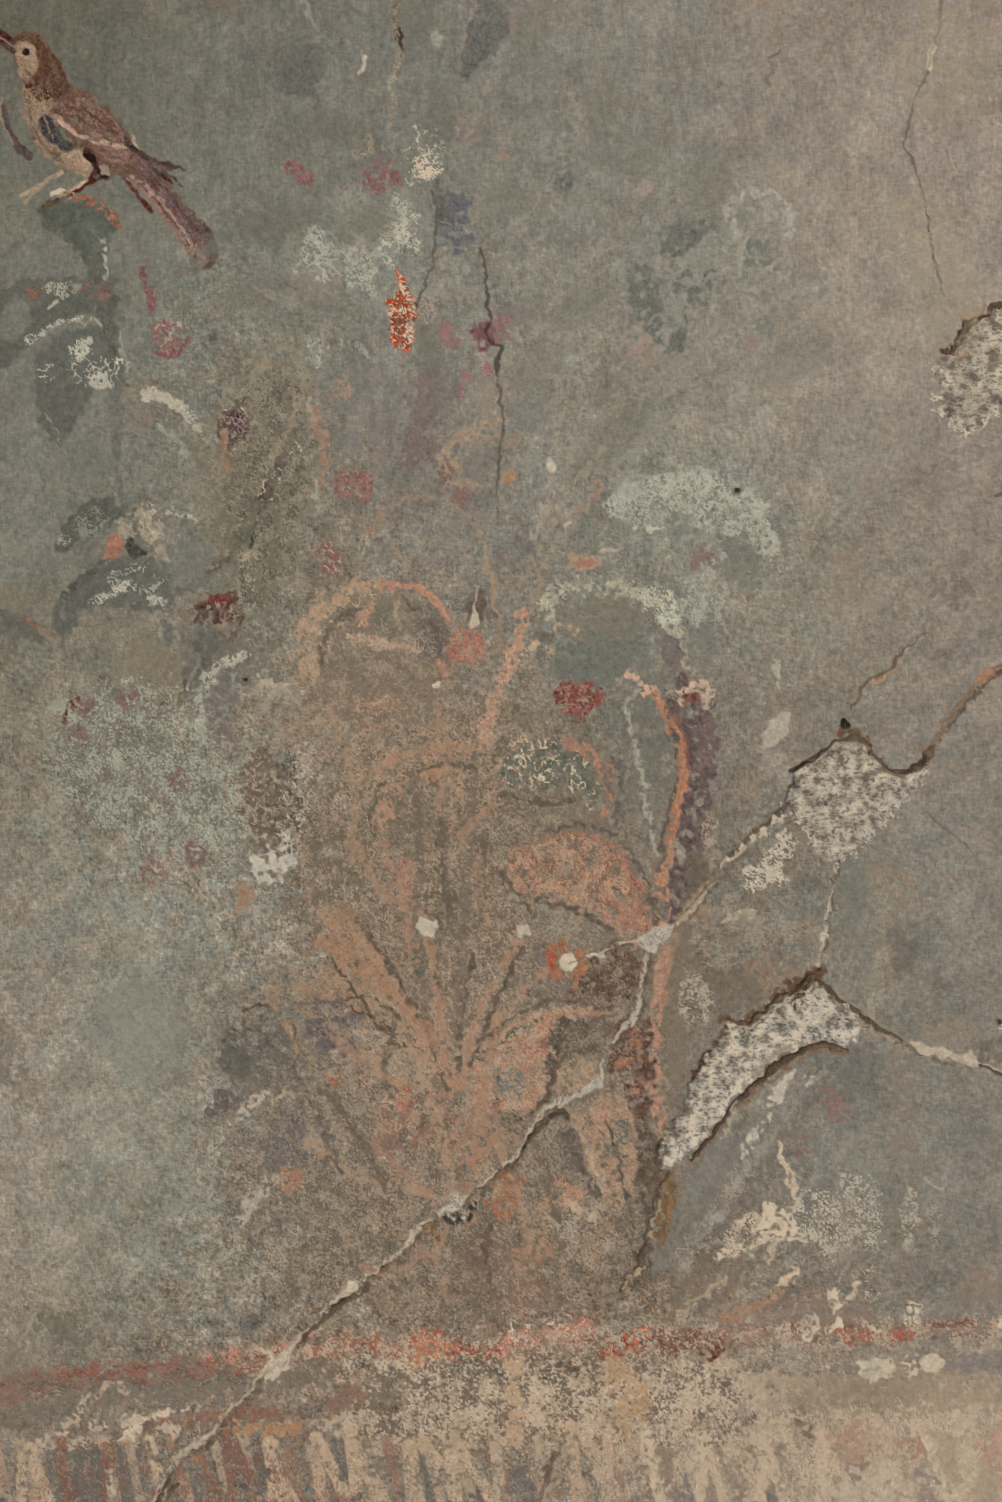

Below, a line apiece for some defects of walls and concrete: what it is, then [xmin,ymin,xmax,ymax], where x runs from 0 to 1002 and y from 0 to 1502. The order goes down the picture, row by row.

crack [900,43,948,301]
crack [476,245,509,529]
spalling [932,301,1002,438]
crack [920,665,1002,758]
spalling [740,727,934,898]
crack [556,799,797,1109]
crack [814,857,1002,1078]
spalling [656,973,871,1168]
crack [441,1194,469,1221]
crack [618,1167,682,1299]
crack [151,1346,295,1502]
crack [536,1431,576,1502]